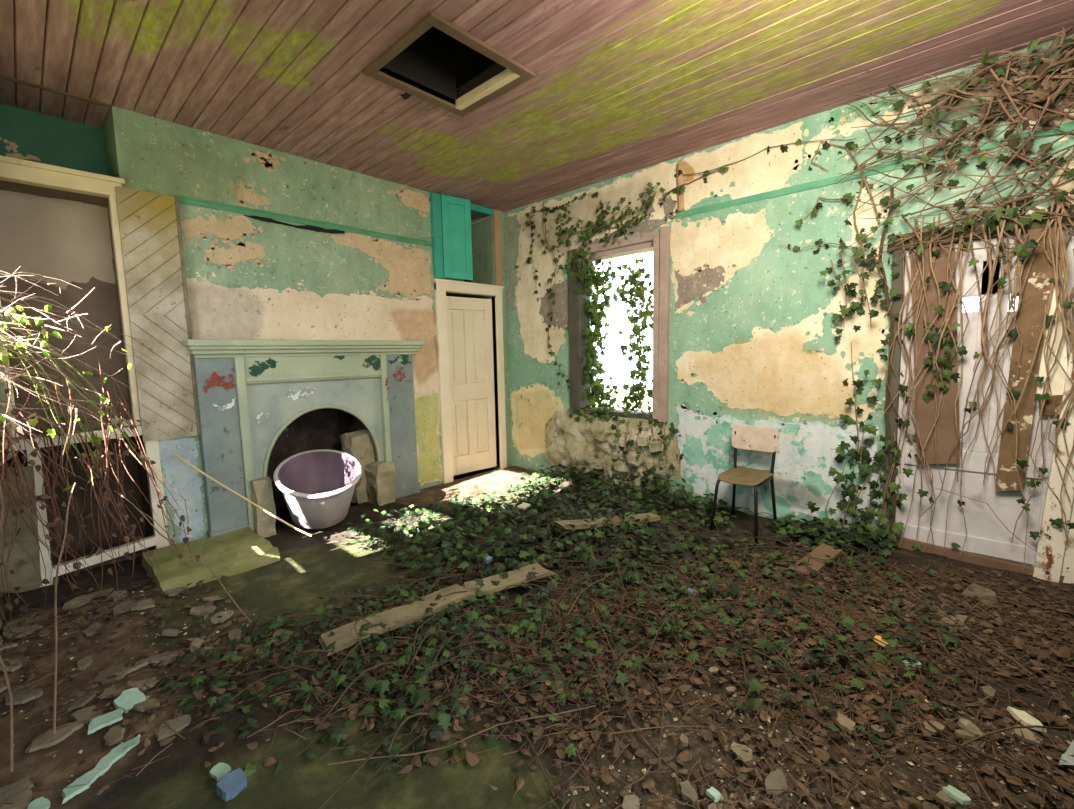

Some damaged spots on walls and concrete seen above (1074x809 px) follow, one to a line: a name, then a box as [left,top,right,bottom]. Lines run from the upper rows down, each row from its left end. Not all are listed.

peeling [243,148,286,172]
crack [244,215,345,234]
peeling [180,177,443,487]
peeling [510,381,564,461]
peeling [507,88,938,364]
peeling [674,185,895,530]